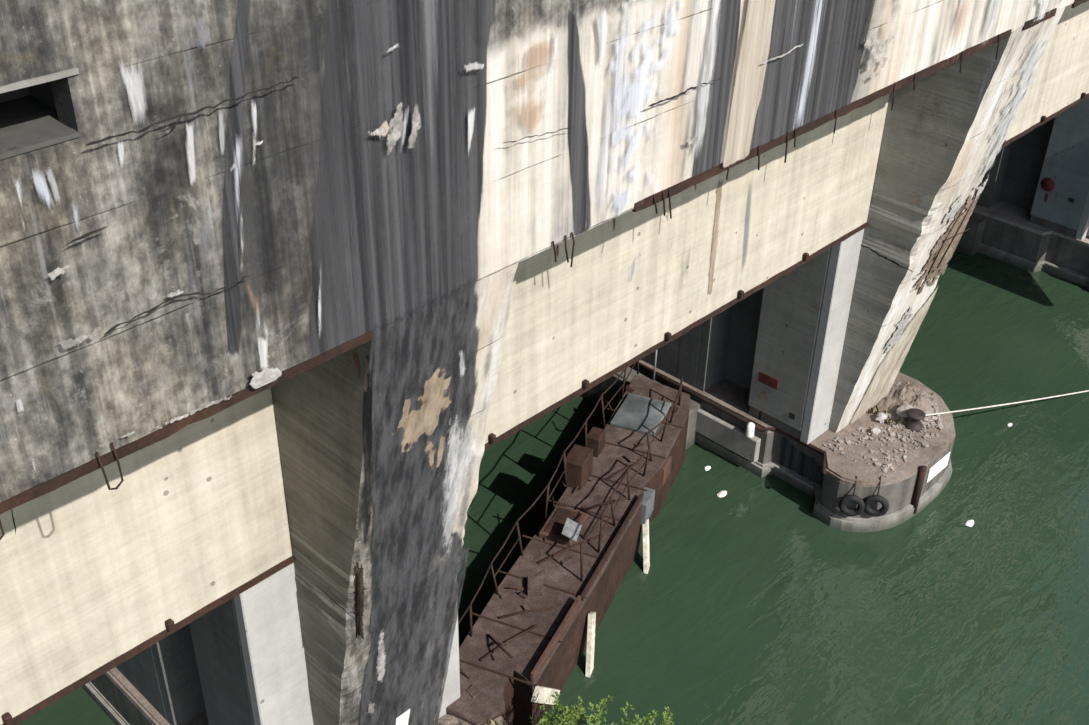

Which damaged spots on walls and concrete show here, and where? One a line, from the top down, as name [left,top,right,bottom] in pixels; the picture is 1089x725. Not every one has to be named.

crack [761,43,804,64]
damp [121,65,145,117]
damp [187,127,195,183]
crack [85,76,300,146]
damp [219,0,332,354]
peeling [371,103,421,154]
crack [648,77,723,107]
spalling [912,179,988,295]
crack [104,275,252,335]
spalling [883,306,913,356]
damp [250,338,282,389]
peeling [392,368,451,469]